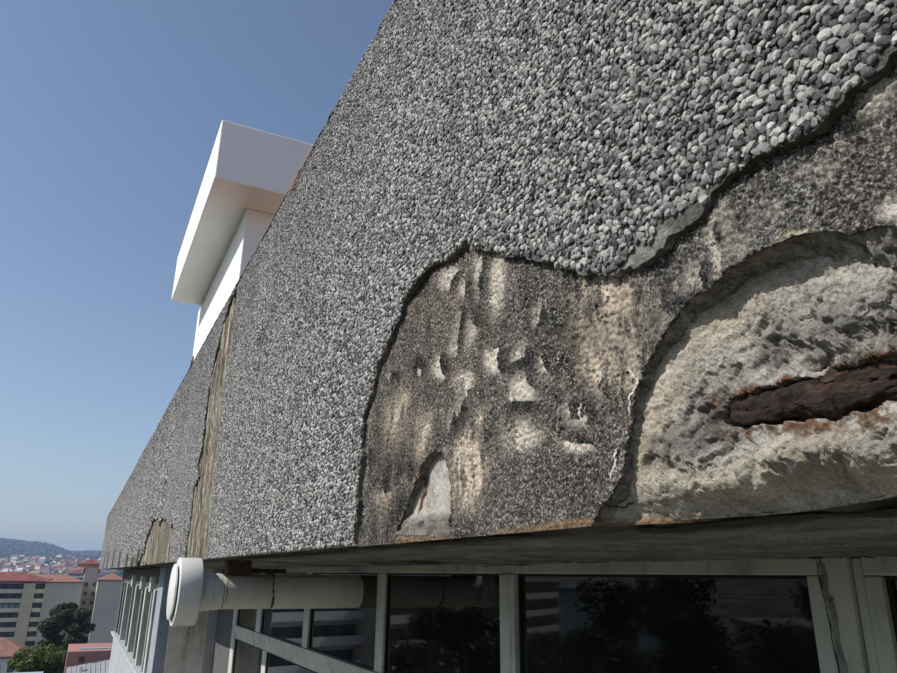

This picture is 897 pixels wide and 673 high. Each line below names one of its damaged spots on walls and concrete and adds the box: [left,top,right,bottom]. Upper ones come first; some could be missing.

efflorescence [854,74,897,113]
efflorescence [875,198,897,223]
peeling [354,60,897,547]
damp [533,196,755,414]
damp [384,375,432,486]
damp [432,250,541,510]
efflorescence [567,398,587,425]
efflorescence [562,440,595,454]
corrosion [710,345,897,437]
crack [583,486,695,508]
peeling [139,519,174,566]